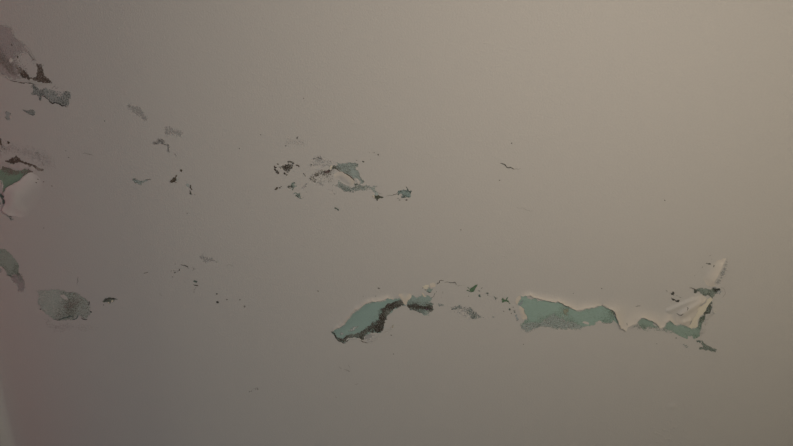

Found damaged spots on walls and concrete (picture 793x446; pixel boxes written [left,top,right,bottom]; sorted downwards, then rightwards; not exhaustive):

peeling [0,25,71,106]
peeling [0,150,49,221]
peeling [309,156,412,201]
peeling [0,249,25,291]
peeling [37,289,92,321]
peeling [331,282,436,344]
peeling [466,284,726,352]